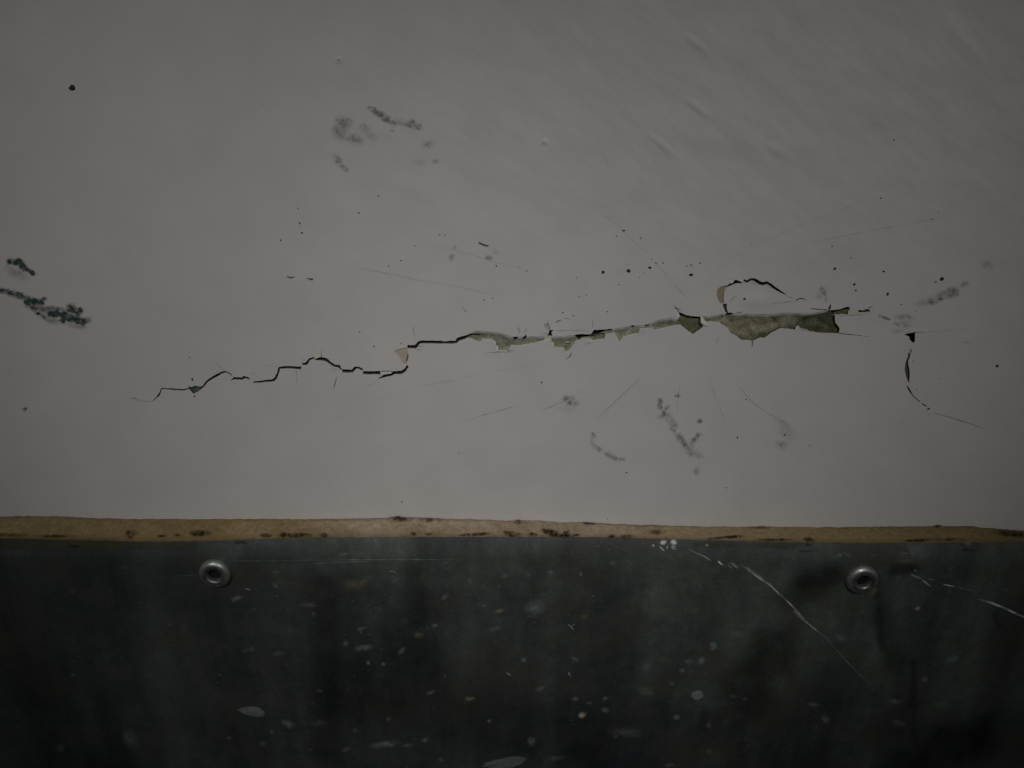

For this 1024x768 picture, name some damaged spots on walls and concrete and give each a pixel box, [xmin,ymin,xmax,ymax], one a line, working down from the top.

damp [7,258,35,276]
damp [0,289,86,325]
spalling [468,300,861,358]
crack [717,278,873,315]
crack [132,330,473,401]
crack [905,349,930,410]